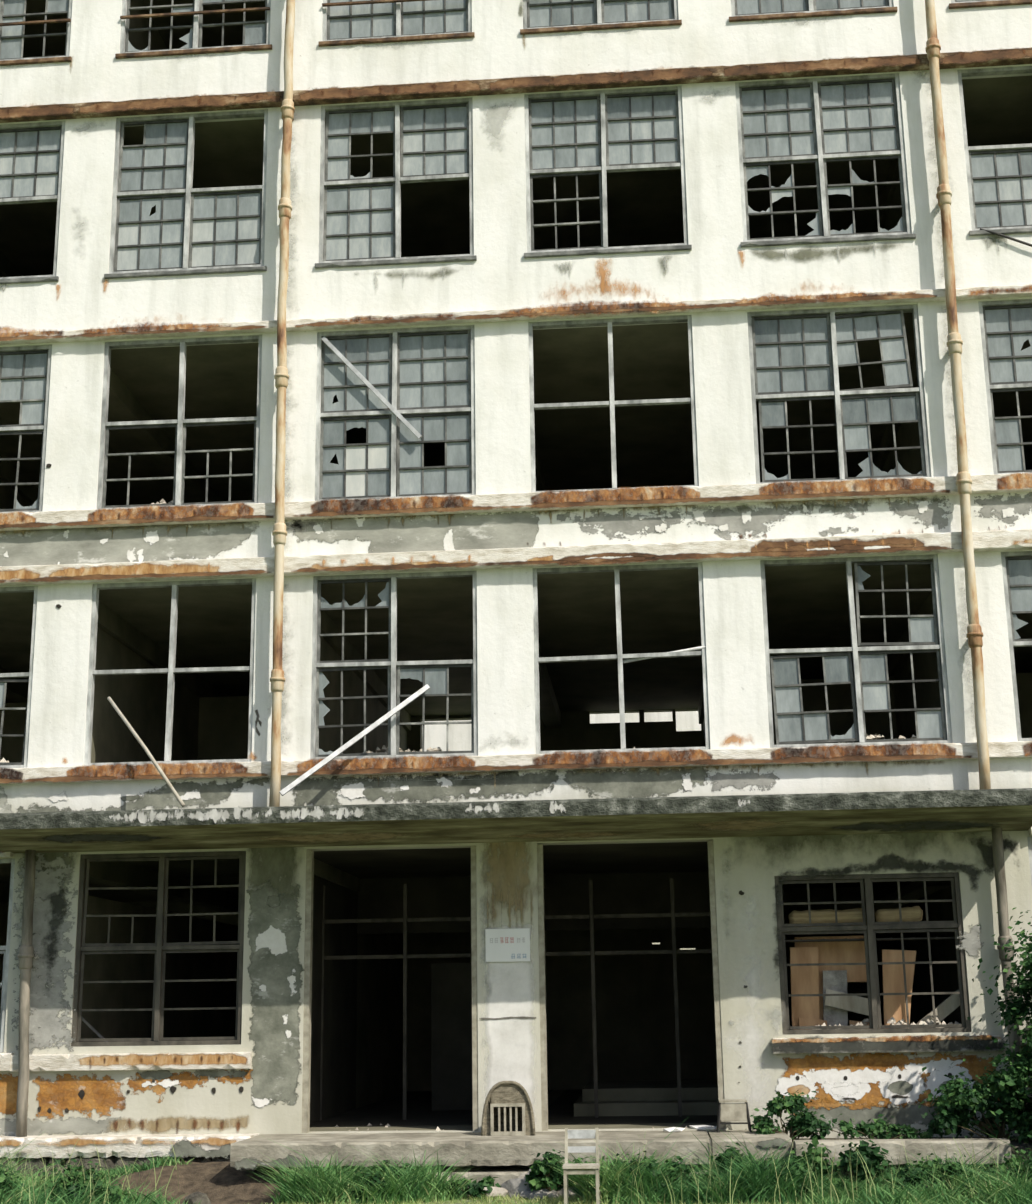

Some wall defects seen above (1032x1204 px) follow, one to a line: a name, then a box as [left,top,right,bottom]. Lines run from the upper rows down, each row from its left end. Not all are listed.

corrosion [0,93,281,118]
corrosion [295,262,937,327]
corrosion [0,322,273,341]
peeling [0,521,259,566]
corrosion [0,503,274,537]
peeling [293,500,914,566]
peeling [0,766,779,824]
damp [23,834,167,969]
damp [483,832,623,935]
damp [697,819,1018,966]
peeling [0,884,304,1120]
flaking render [783,1052,996,1130]